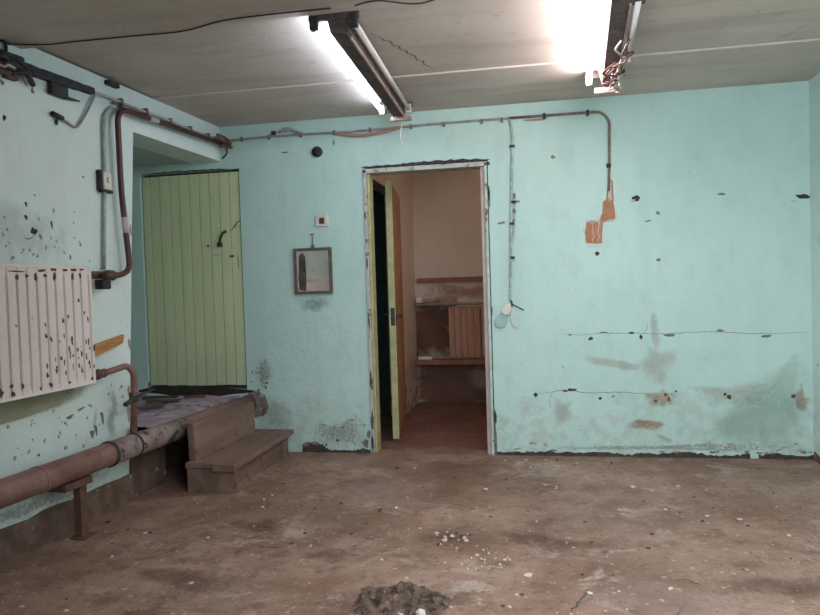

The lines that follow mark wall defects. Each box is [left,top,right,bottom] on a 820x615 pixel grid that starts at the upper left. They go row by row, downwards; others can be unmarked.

flaking render [583,178,617,246]